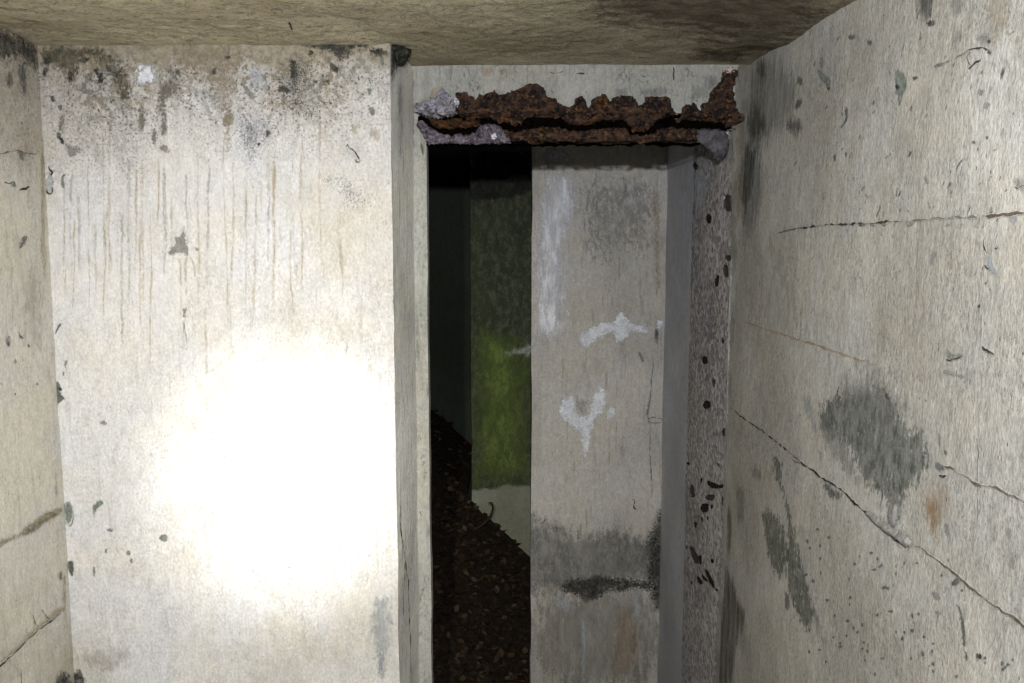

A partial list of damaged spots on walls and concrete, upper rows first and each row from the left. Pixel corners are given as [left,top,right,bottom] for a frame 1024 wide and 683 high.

leakage [0,28,459,165]
rust [529,83,546,100]
rust [418,94,736,136]
crack [777,184,1024,234]
leakage [580,0,827,683]
crack [730,407,868,513]
leakage [806,370,929,547]
crack [937,436,1024,528]
leakage [531,508,661,683]
crack [888,535,1024,628]